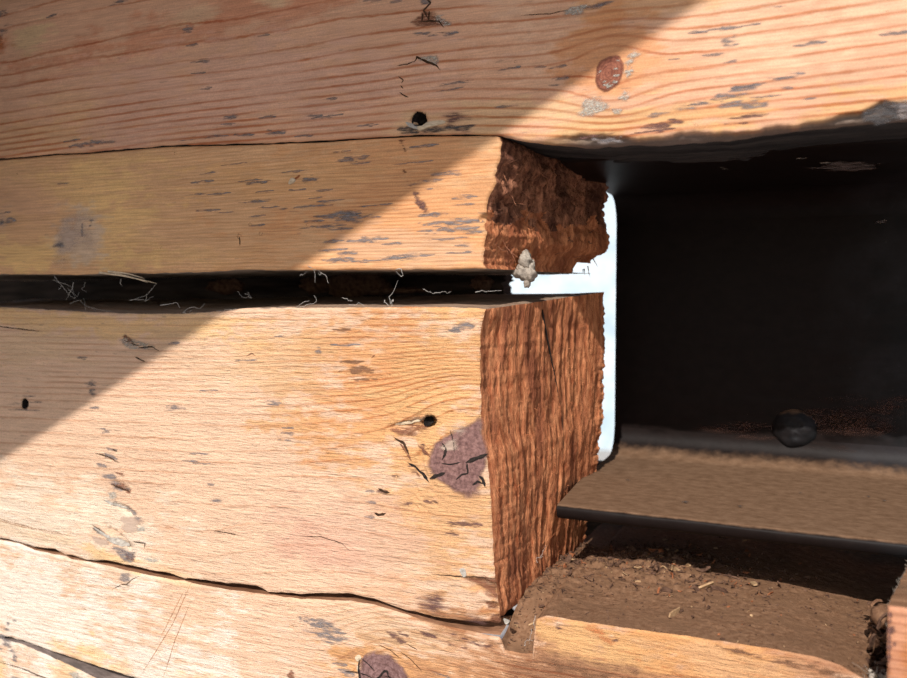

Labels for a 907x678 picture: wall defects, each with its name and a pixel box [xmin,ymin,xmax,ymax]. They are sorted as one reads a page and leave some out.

crack [0,518,512,635]
crack [0,636,135,678]